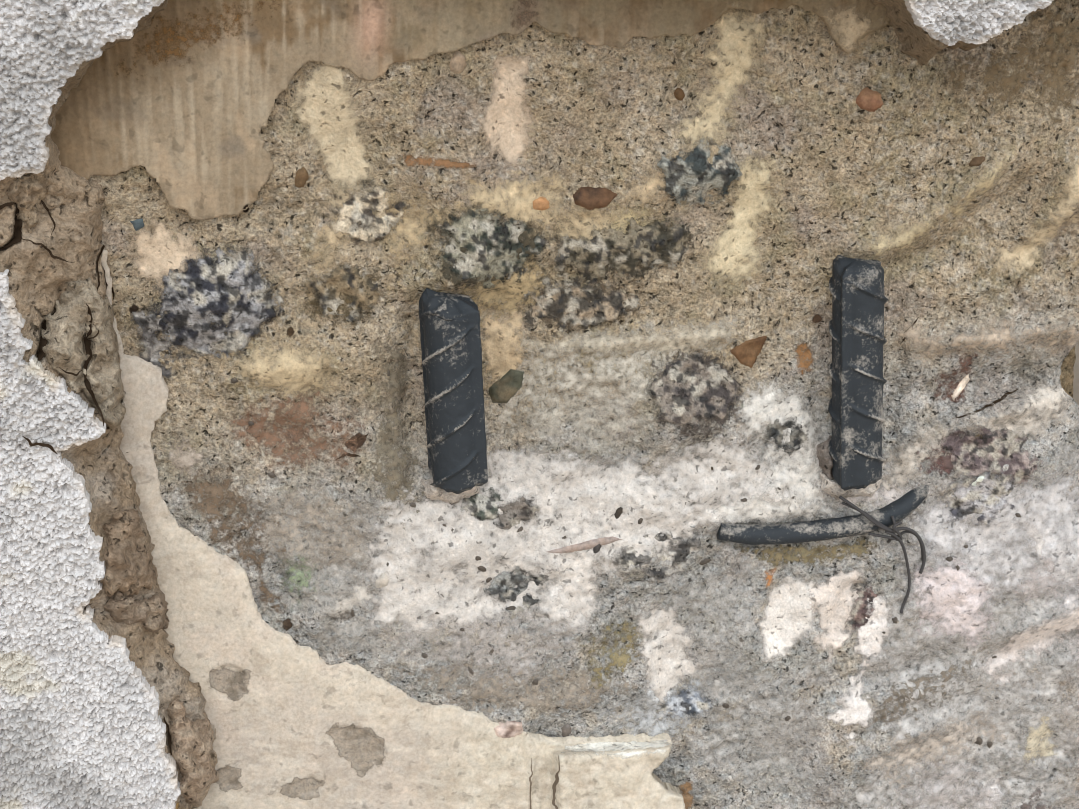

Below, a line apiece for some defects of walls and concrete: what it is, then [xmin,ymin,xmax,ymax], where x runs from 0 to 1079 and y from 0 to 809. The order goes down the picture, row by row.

spalling [100,0,168,52]
crack [0,200,116,430]
spalling [419,288,513,494]
spalling [828,255,888,491]
spalling [61,425,155,566]
spalling [717,467,891,545]
spalling [867,485,929,529]
spalling [896,456,987,532]
spalling [84,579,210,756]
flaking render [209,668,251,701]
flaking render [280,777,325,800]
crack [529,755,560,809]